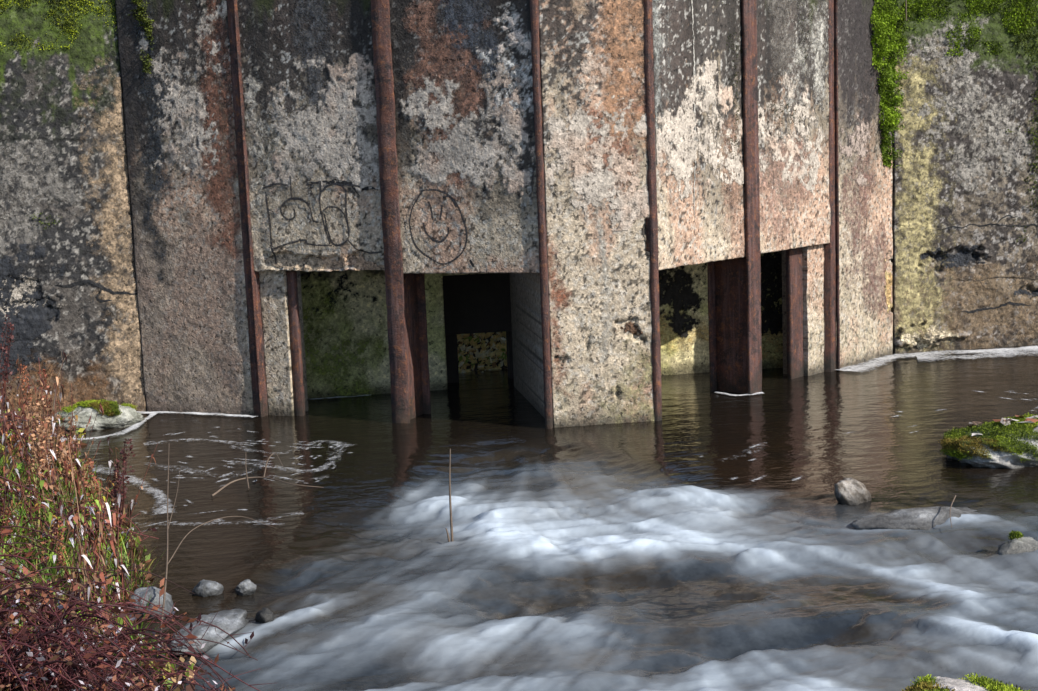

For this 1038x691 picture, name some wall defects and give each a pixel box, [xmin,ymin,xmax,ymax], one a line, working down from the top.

rust [202,0,243,256]
rust [405,0,481,197]
rust [587,0,646,185]
water stain [767,0,827,110]
water stain [92,78,144,402]